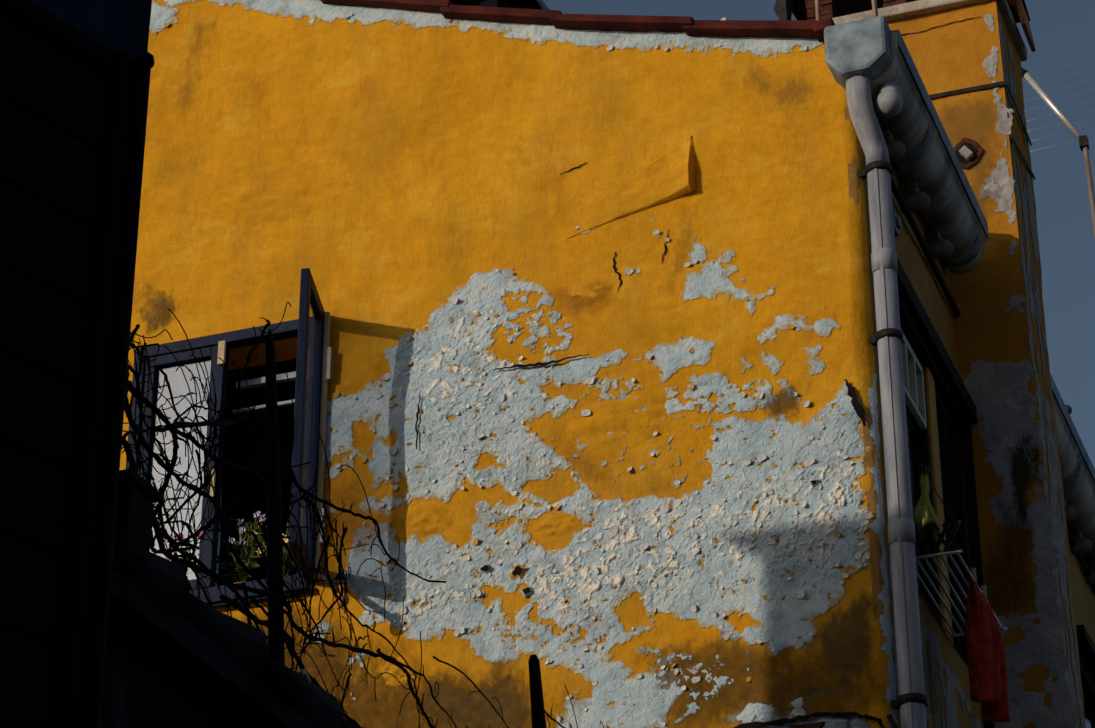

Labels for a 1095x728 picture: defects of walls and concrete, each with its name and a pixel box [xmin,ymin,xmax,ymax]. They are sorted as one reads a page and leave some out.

peeling [149,0,823,58]
damp [140,292,174,330]
peeling [680,236,776,315]
peeling [919,12,1085,728]
peeling [324,267,901,728]
peeling [306,619,332,643]